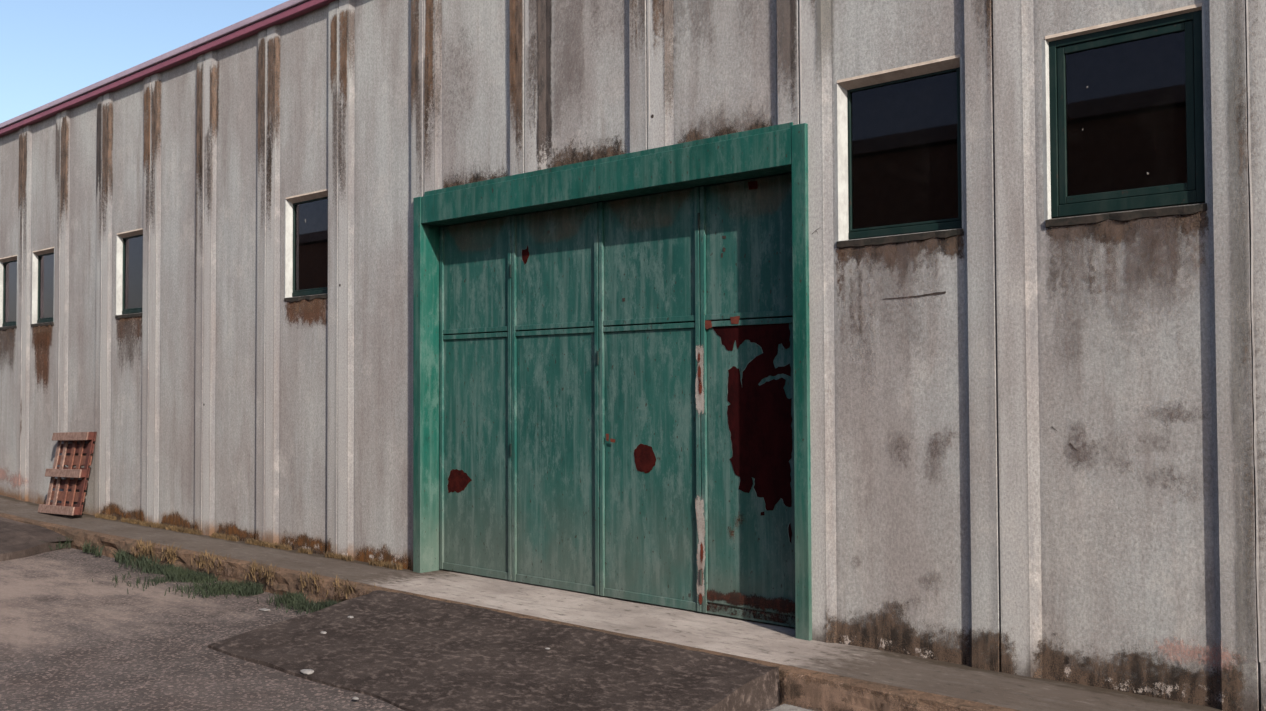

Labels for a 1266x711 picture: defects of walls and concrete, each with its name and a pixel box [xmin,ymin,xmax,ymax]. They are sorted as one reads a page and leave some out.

water stain [257,36,281,224]
water stain [330,9,355,205]
water stain [411,0,442,180]
water stain [509,0,622,170]
water stain [835,232,964,333]
water stain [1046,211,1209,297]
peeling [447,469,472,493]
peeling [633,443,656,473]
peeling [695,344,704,414]
peeling [705,316,792,516]
peeling [695,495,706,605]